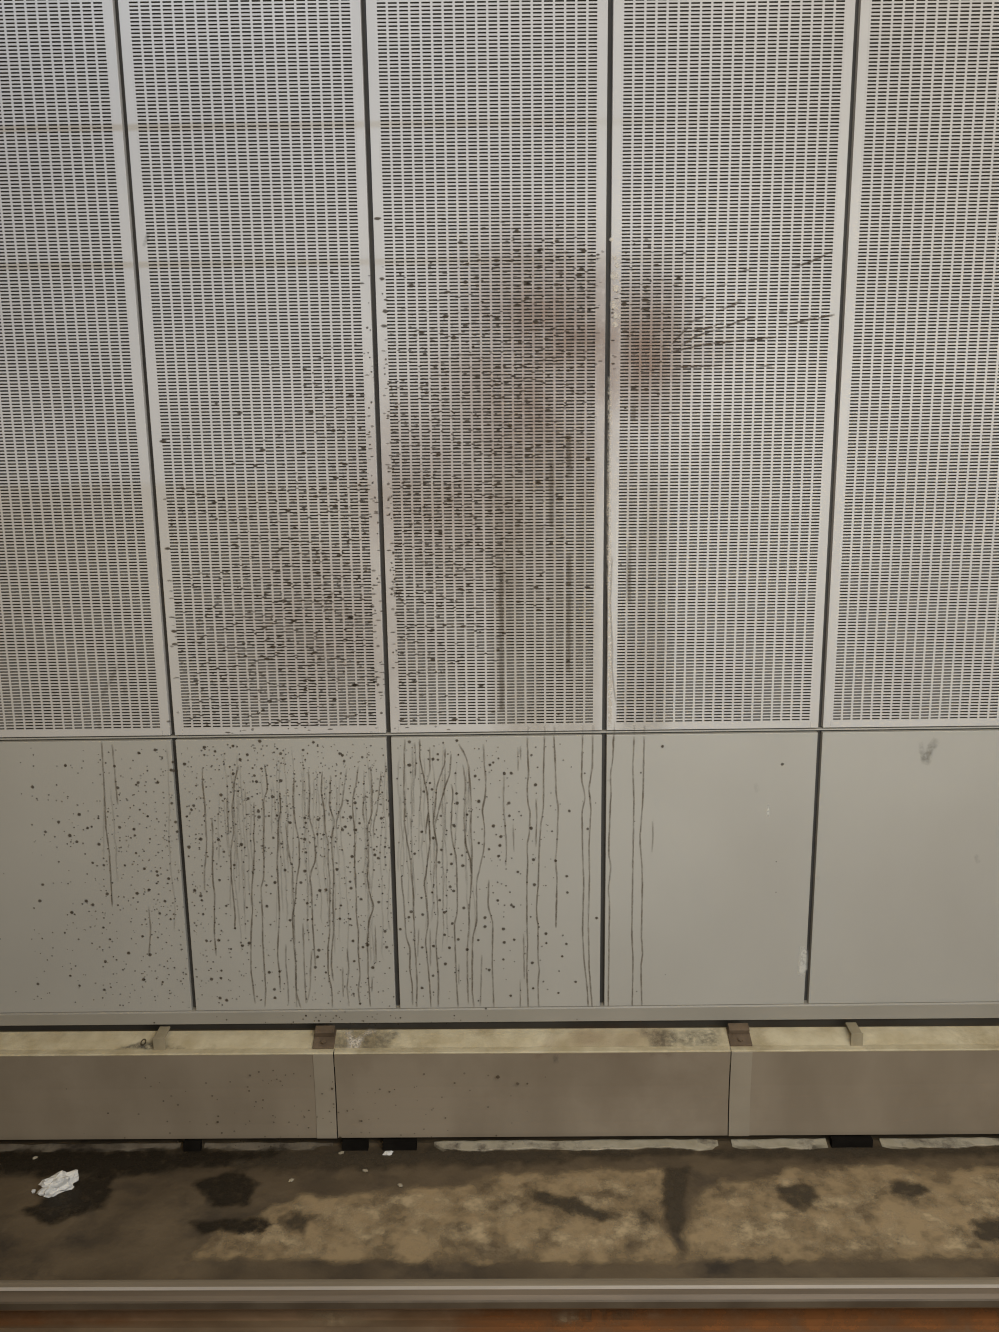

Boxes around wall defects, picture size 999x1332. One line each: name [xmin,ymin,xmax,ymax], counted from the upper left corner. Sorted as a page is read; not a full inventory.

water stain [40,221,772,1048]